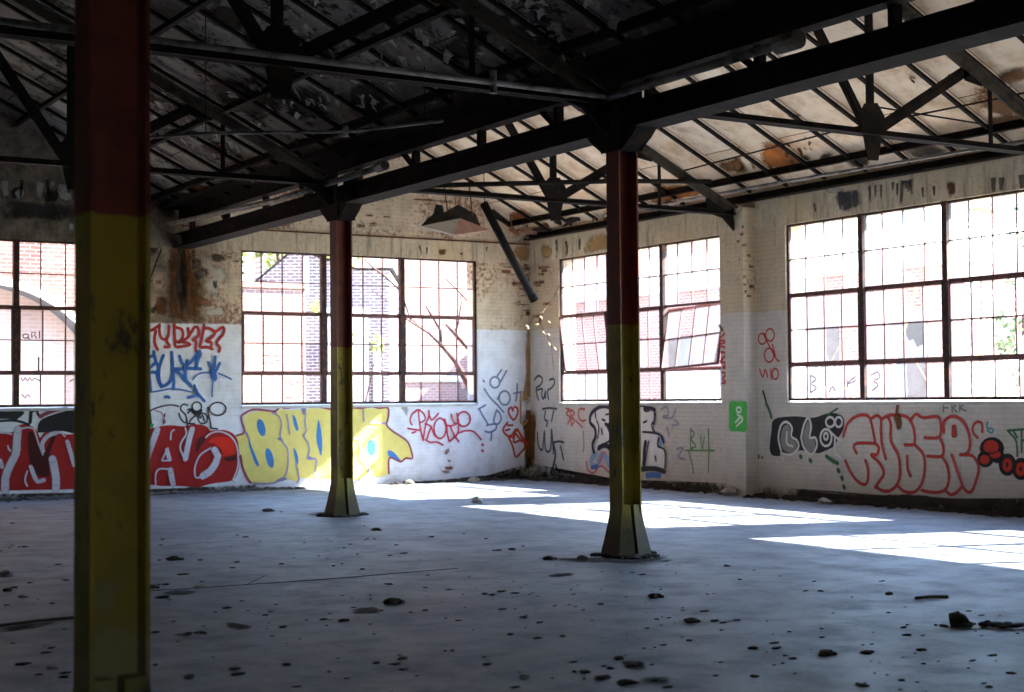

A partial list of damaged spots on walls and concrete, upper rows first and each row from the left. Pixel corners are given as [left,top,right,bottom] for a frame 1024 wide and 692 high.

peeling [318,11,521,68]
peeling [494,0,628,62]
peeling [150,73,397,182]
rust [760,143,800,168]
rust [155,245,208,322]
peeling [200,253,239,316]